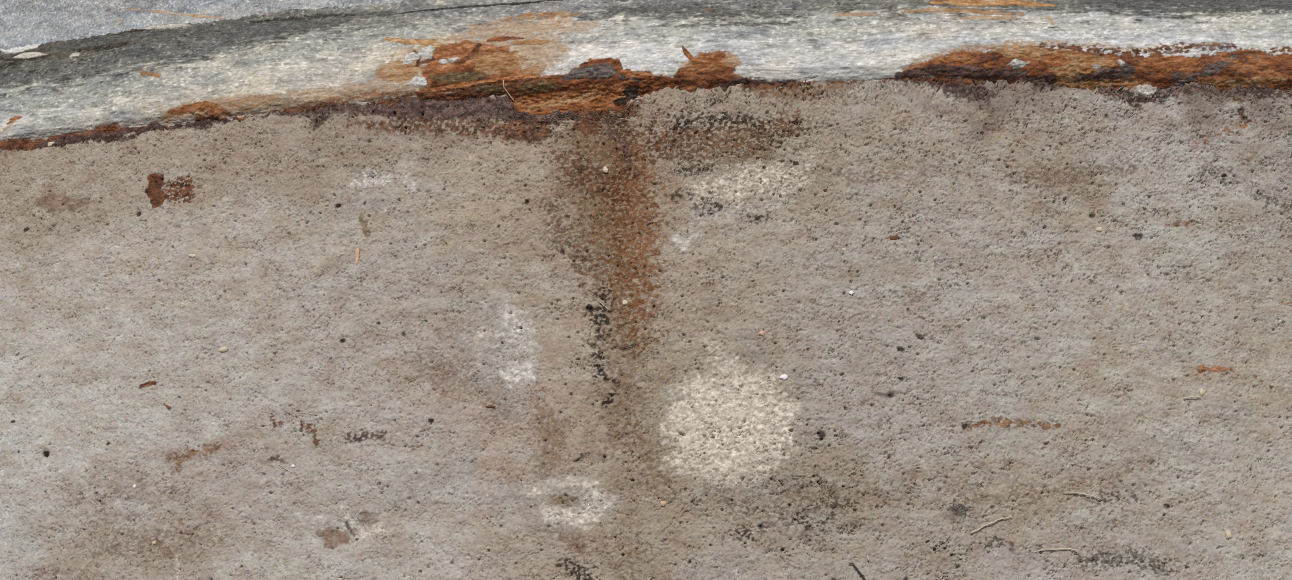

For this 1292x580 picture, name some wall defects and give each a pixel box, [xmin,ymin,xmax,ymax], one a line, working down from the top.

corrosion [901,0,1055,24]
corrosion [1039,42,1237,58]
corrosion [1098,84,1292,143]
corrosion [0,11,996,439]
corrosion [345,431,387,443]
efflorescence [658,331,805,494]